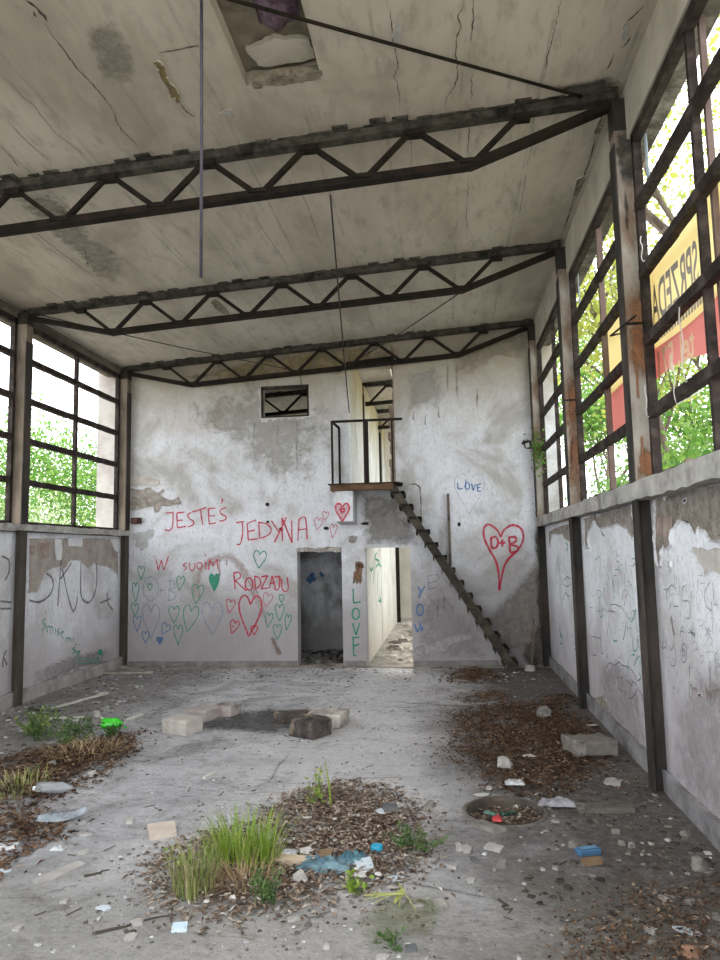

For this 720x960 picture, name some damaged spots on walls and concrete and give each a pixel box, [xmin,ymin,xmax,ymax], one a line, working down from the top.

crack [27,1,135,142]
spalling [150,59,194,117]
crack [387,5,400,104]
crack [445,1,474,107]
corrosion [630,293,645,398]
flaking render [27,537,119,594]
flaking render [130,475,182,513]
corrosion [568,381,580,484]
corrosion [639,437,652,476]
flaking render [652,482,720,577]